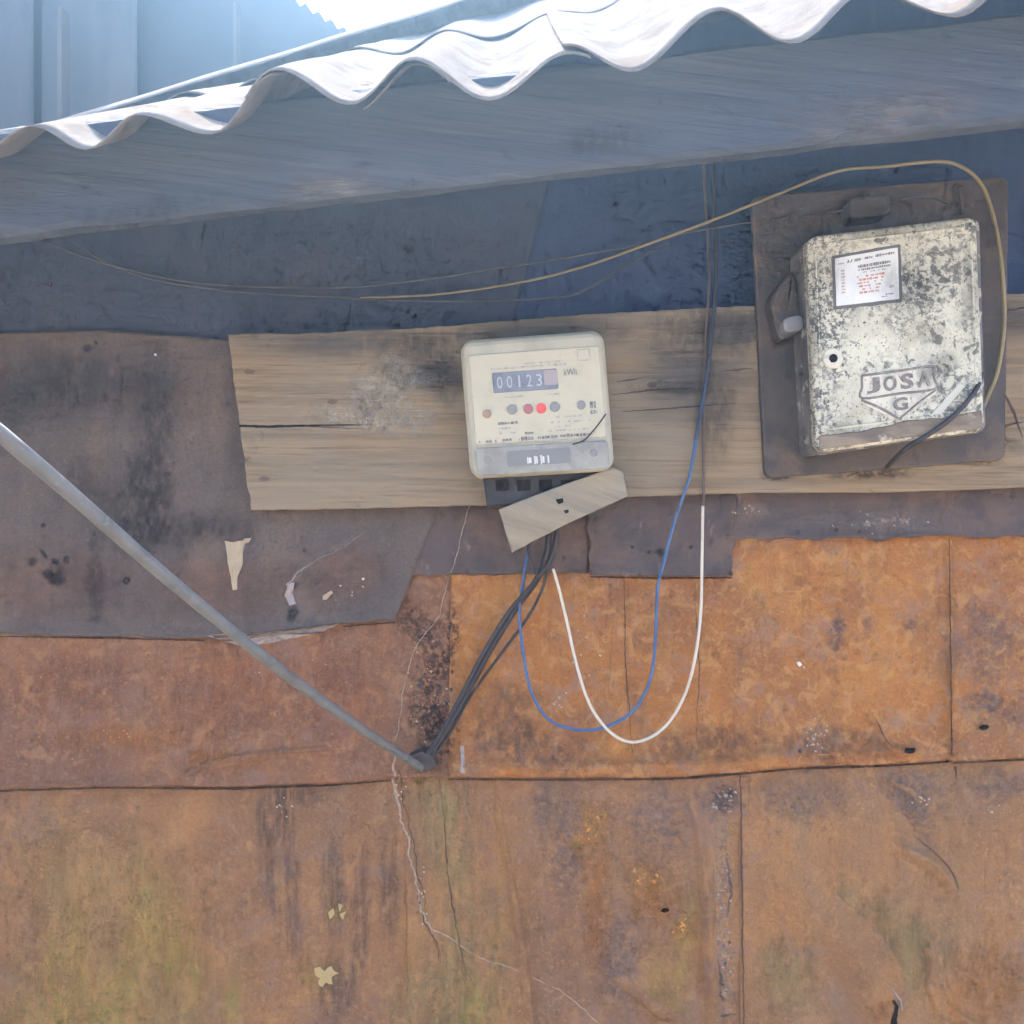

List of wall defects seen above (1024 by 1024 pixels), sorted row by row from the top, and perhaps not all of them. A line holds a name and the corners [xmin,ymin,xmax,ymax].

crack [239,422,379,430]
rust [0,780,391,792]
crack [391,757,600,1024]
rust [448,539,1024,1024]